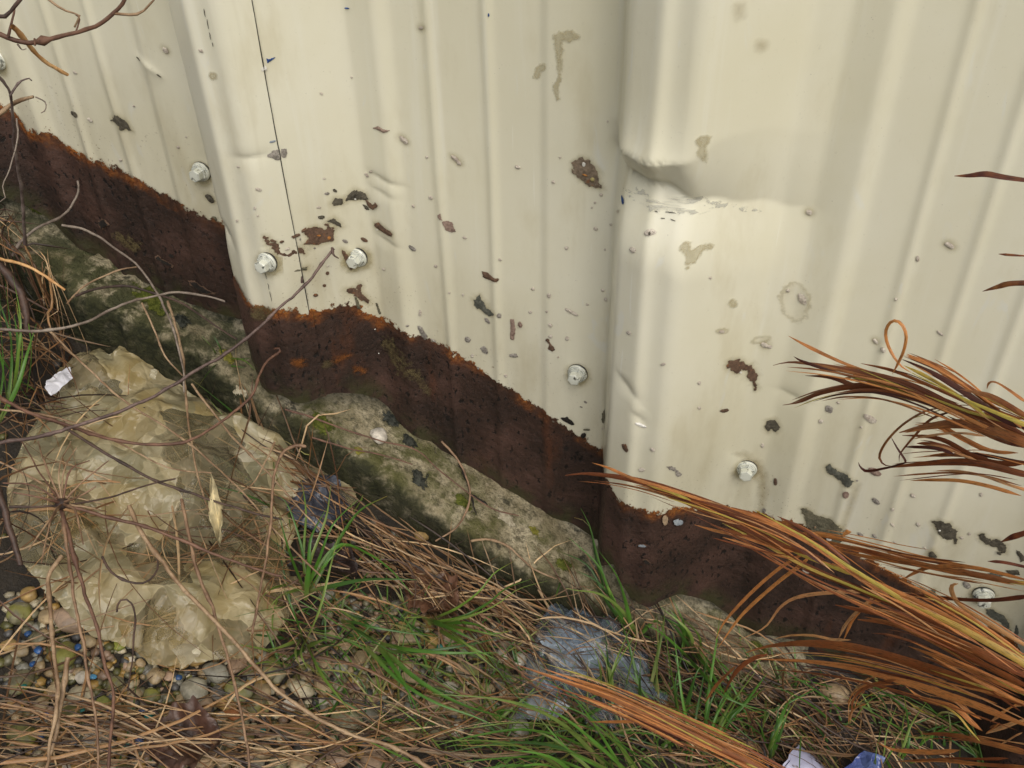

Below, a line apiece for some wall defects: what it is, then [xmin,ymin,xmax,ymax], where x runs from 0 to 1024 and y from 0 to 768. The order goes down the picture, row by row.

rust [0,104,1024,701]
peeling [826,464,854,499]
peeling [801,508,851,543]
peeling [932,521,958,544]
rust [814,647,1024,768]